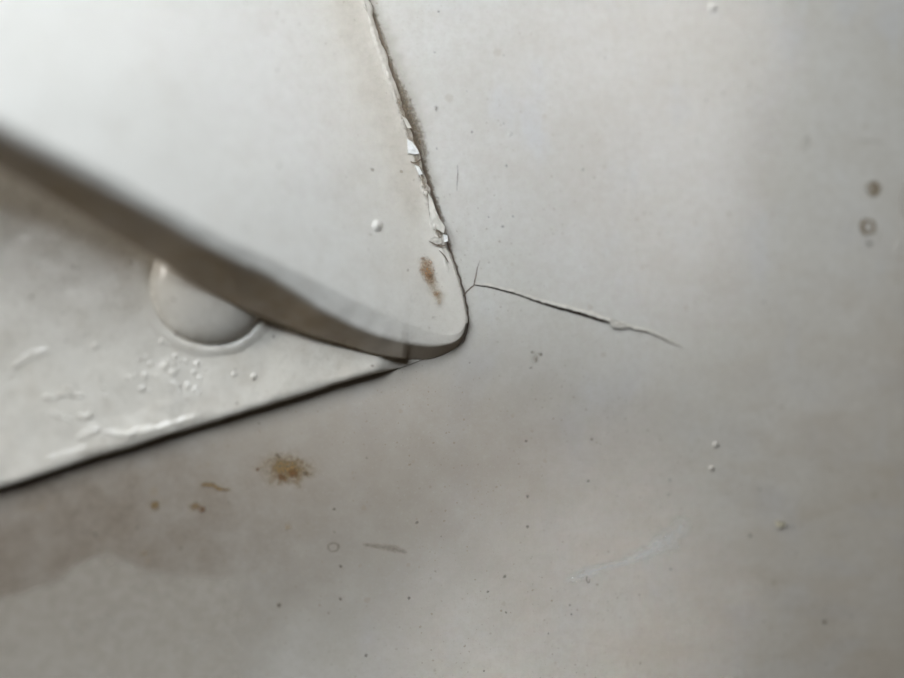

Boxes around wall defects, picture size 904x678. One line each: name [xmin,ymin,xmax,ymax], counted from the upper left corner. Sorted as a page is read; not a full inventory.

peeling [360,0,399,105]
peeling [402,116,450,274]
crack [463,261,682,347]